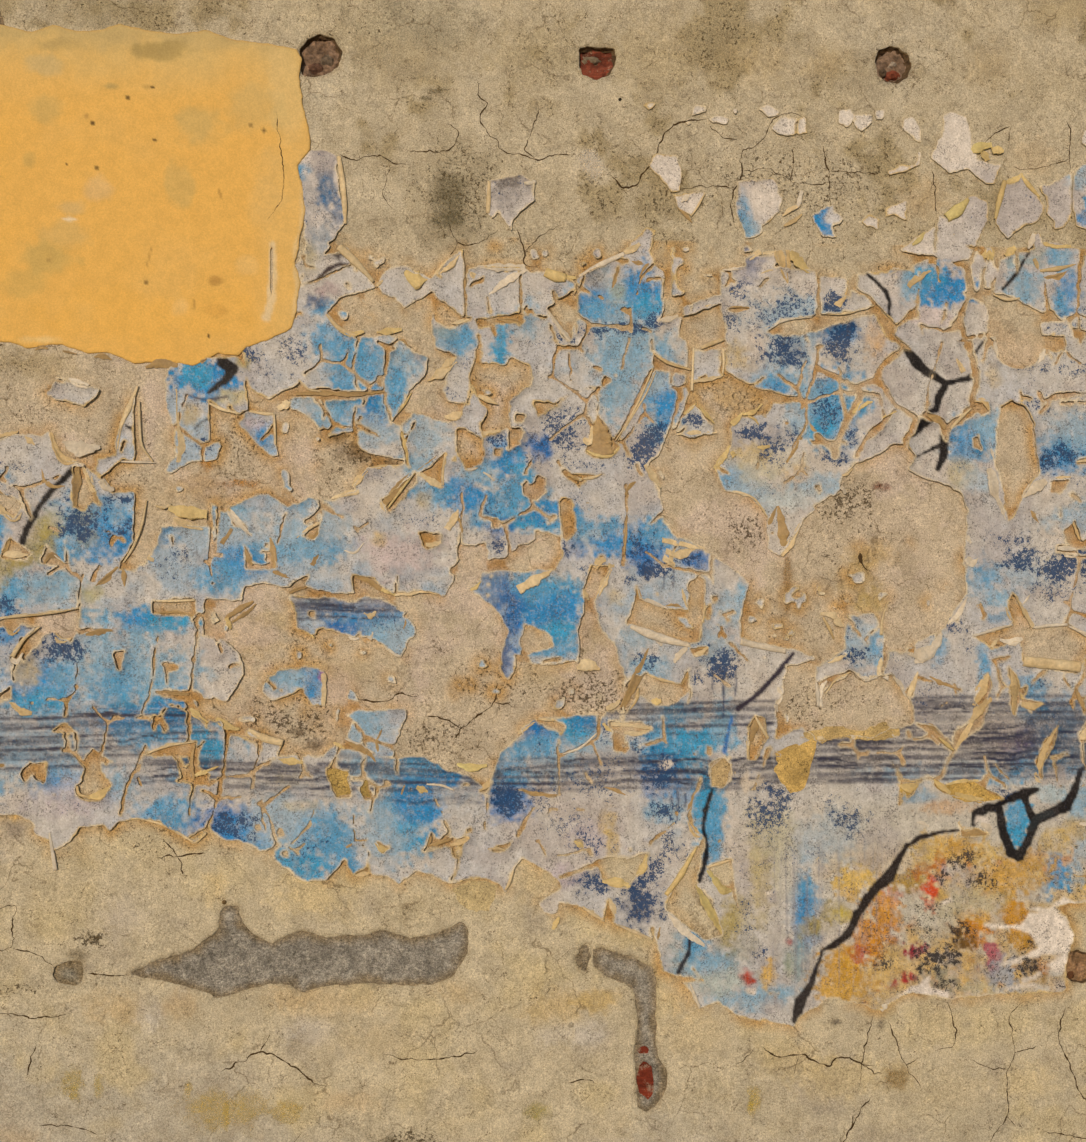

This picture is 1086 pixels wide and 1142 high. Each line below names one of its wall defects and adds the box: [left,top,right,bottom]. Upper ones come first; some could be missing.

crack [340,82,569,210]
crack [606,112,878,232]
peeling [759,105,807,136]
peeling [838,109,885,131]
peeling [888,117,921,175]
peeling [931,111,1004,184]
crack [1016,123,1071,171]
crack [449,224,559,267]
peeling [0,149,1086,1026]
crack [224,1035,325,1086]
flaking render [576,945,667,1111]
crack [736,1002,1086,1142]